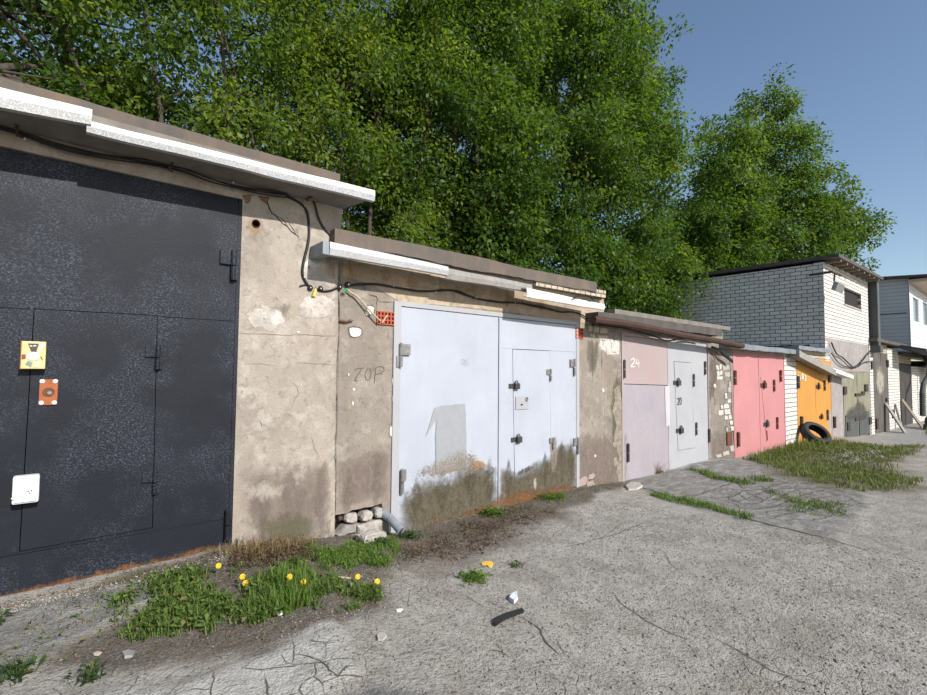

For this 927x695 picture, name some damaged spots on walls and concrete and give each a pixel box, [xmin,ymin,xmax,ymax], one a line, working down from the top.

crack [267,201,299,238]
flaking render [587,325,620,353]
leakage [588,338,620,369]
flaking render [713,364,734,433]
rust [462,486,575,517]